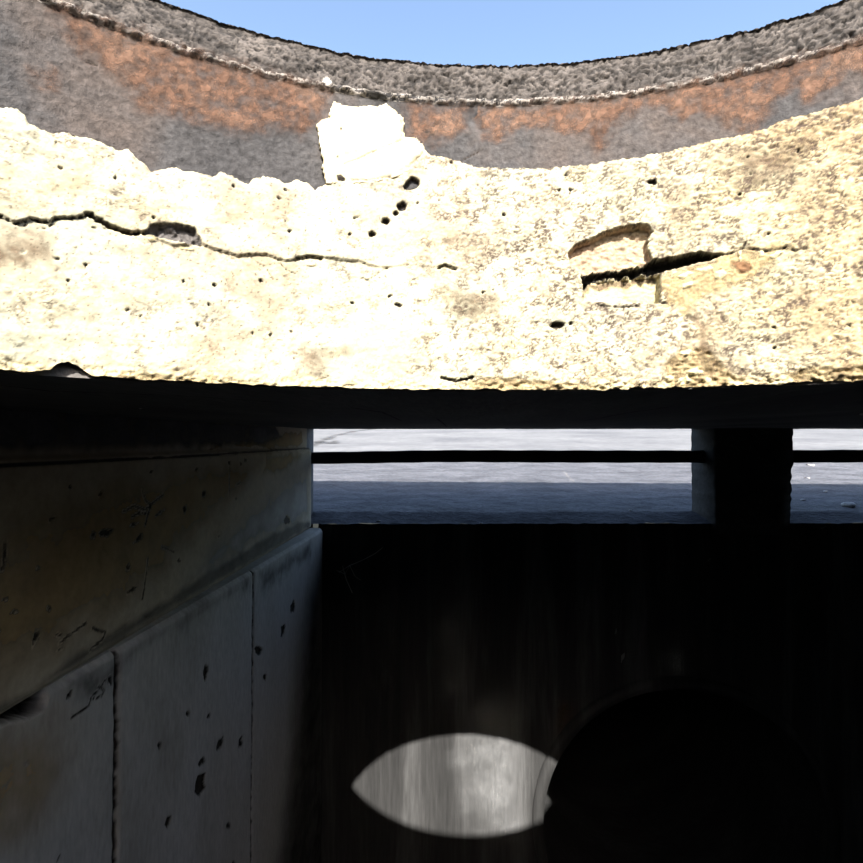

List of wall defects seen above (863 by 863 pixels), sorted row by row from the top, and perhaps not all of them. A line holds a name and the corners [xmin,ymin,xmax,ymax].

rust [411,106,464,138]
crack [0,213,143,236]
spalling [145,224,201,250]
spalling [568,225,807,308]